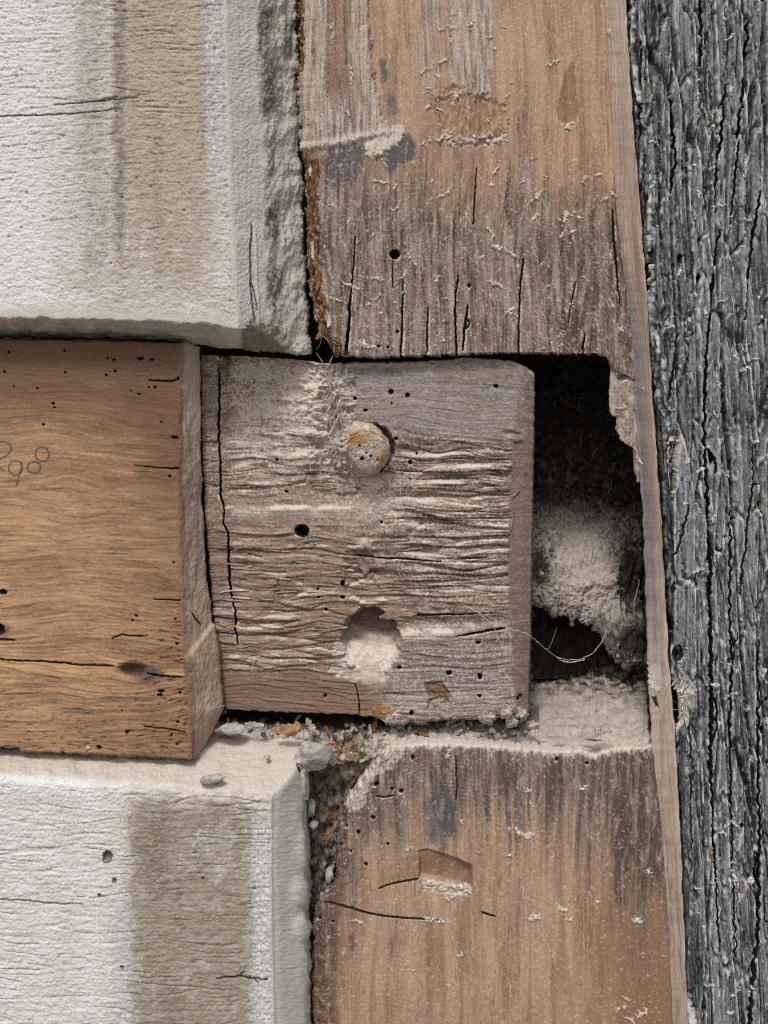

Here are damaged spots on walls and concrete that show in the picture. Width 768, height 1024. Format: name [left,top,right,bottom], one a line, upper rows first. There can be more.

crack [217,367,238,644]
crack [0,639,114,666]
leakage [114,801,272,1024]
crack [327,878,438,921]